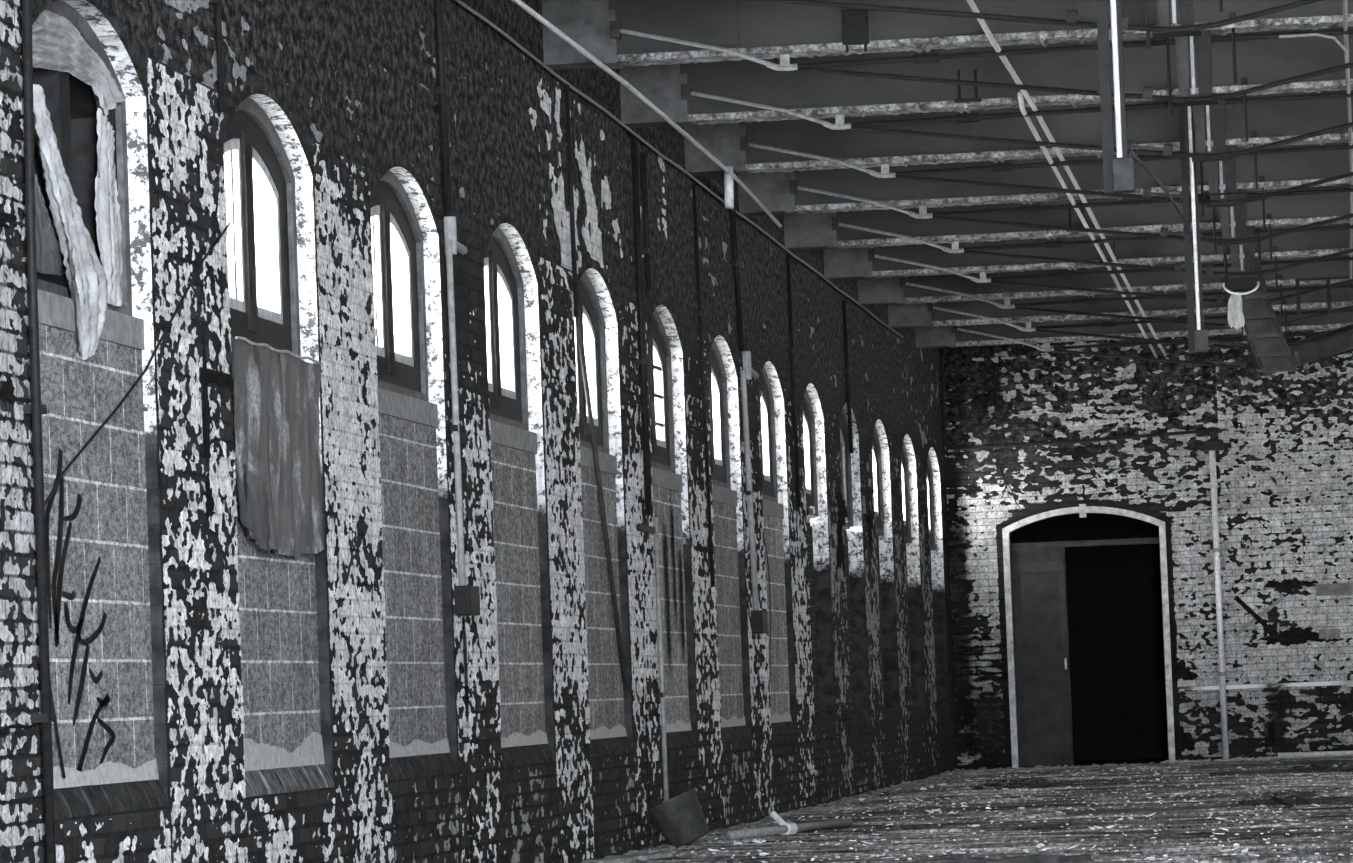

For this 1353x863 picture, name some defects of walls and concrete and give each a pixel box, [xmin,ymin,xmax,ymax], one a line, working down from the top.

peeling [0,0,111,863]
peeling [112,0,665,863]
peeling [643,155,678,239]
peeling [692,216,744,296]
peeling [679,331,1353,825]